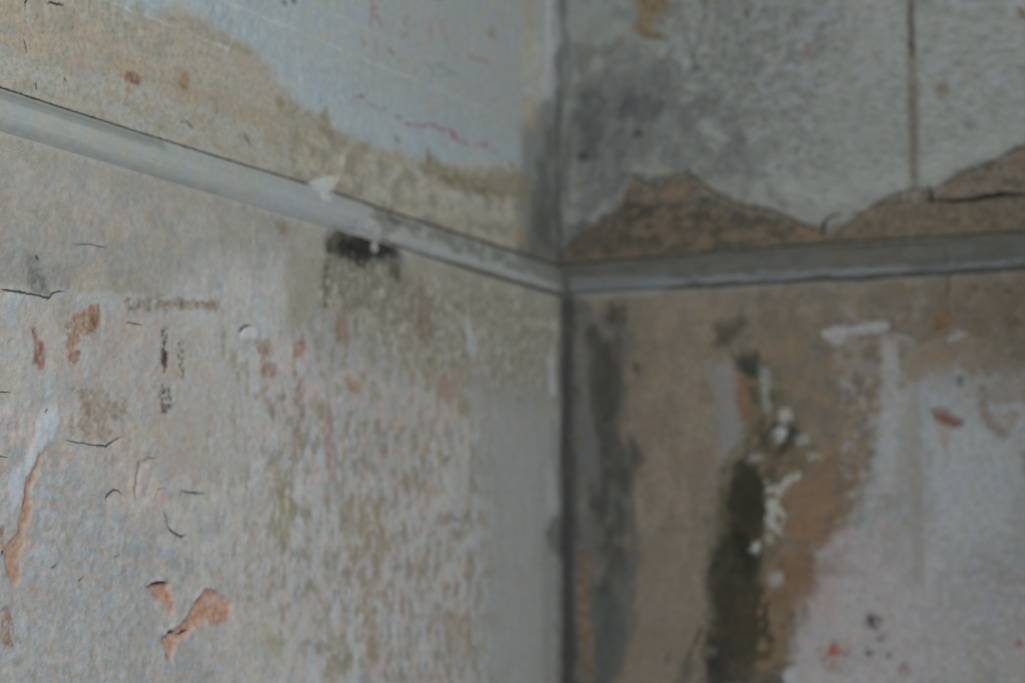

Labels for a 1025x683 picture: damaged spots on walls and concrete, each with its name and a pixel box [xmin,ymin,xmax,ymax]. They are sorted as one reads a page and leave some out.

spalling [563,139,1025,263]
crack [1,289,64,300]
damp [317,202,441,354]
damp [543,293,651,683]
damp [684,276,1025,683]
spalling [145,576,234,666]